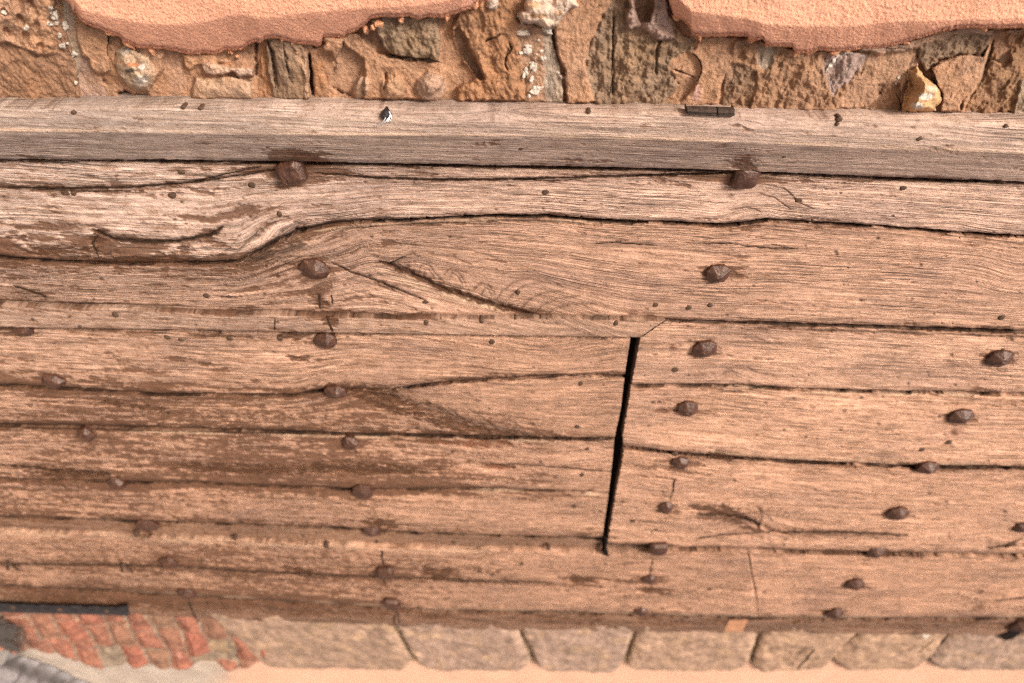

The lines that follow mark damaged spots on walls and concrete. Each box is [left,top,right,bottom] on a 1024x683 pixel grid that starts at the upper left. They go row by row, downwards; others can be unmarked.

flaking render [72,0,499,58]
spalling [516,0,579,36]
flaking render [672,14,1024,57]